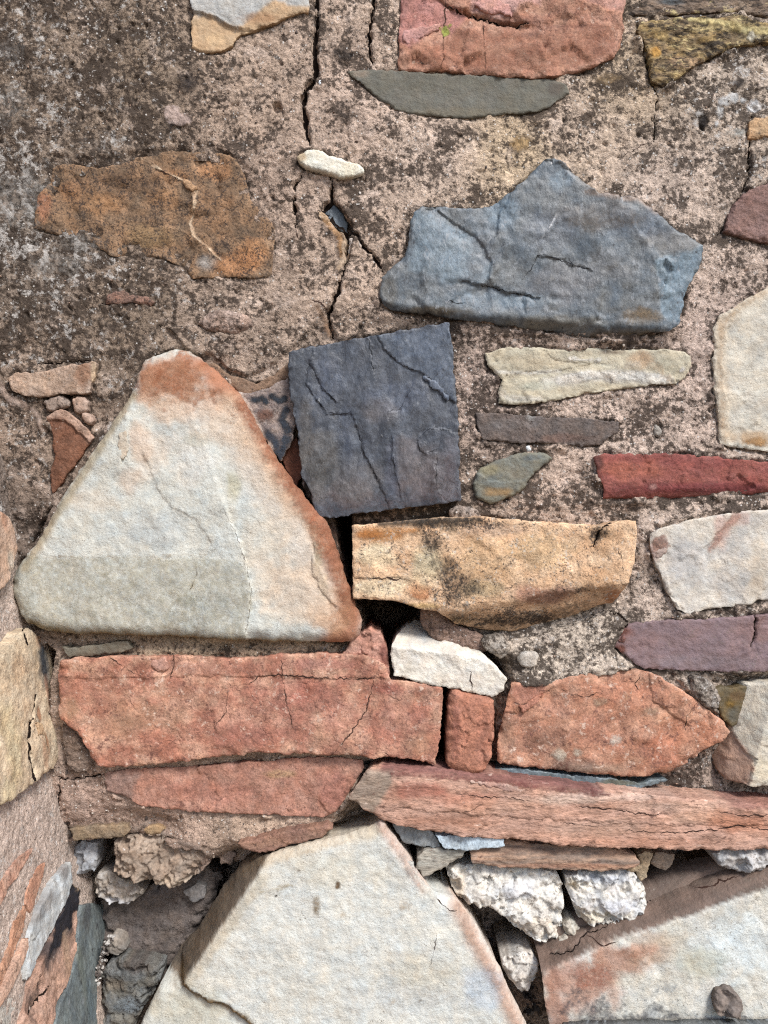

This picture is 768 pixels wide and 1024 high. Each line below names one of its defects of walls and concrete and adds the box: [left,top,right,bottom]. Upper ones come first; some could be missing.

crack [293,0,383,339]
crack [250,661,384,752]